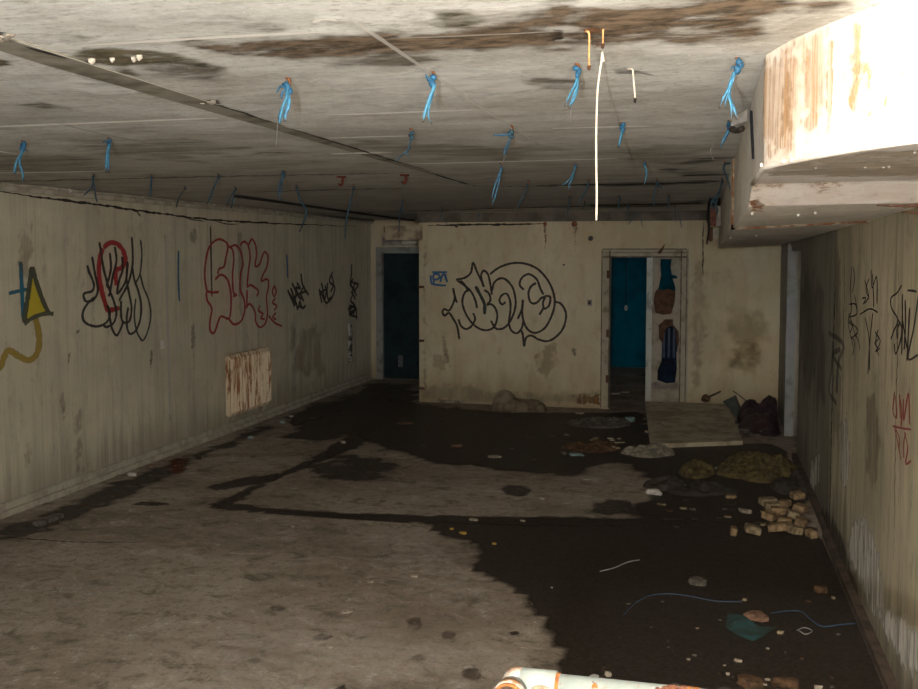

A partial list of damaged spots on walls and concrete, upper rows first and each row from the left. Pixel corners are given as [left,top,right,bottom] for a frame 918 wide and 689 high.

water stain [75,49,223,79]
water stain [183,0,845,107]
rust [763,44,795,158]
rust [806,35,833,130]
rust [849,25,872,111]